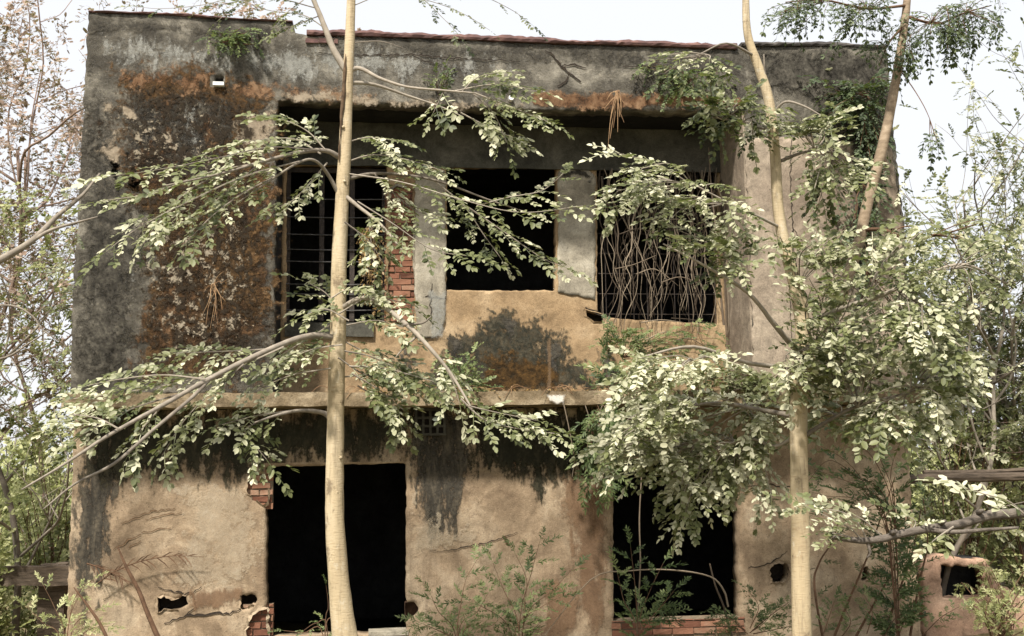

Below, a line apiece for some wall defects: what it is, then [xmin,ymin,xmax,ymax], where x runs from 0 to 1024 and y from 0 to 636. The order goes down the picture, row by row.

leakage [89,20,568,108]
leakage [63,87,285,390]
flaking render [384,183,416,327]
leakage [429,291,616,403]
flaking render [244,469,274,509]
leakage [408,408,472,544]
leakage [69,460,119,636]
spalling [154,593,188,614]
flaking render [238,594,274,636]
crack [434,532,517,552]
spalling [766,560,791,586]